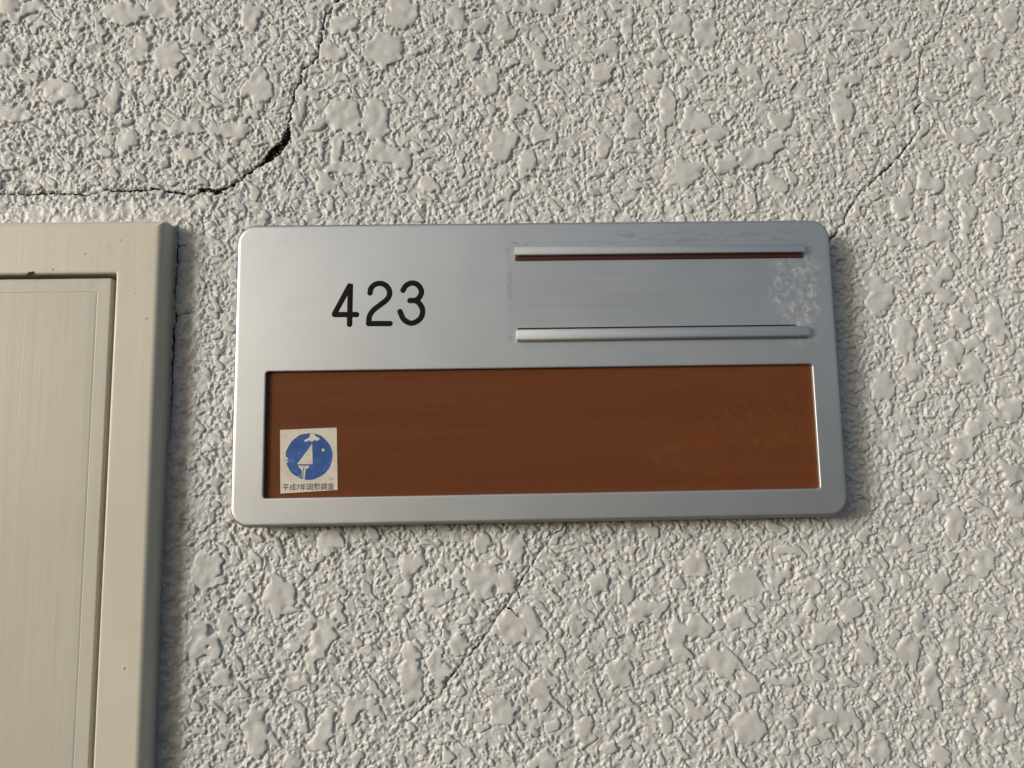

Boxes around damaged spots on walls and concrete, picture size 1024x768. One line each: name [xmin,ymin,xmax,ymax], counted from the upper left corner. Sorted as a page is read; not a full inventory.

crack [0,0,340,198]